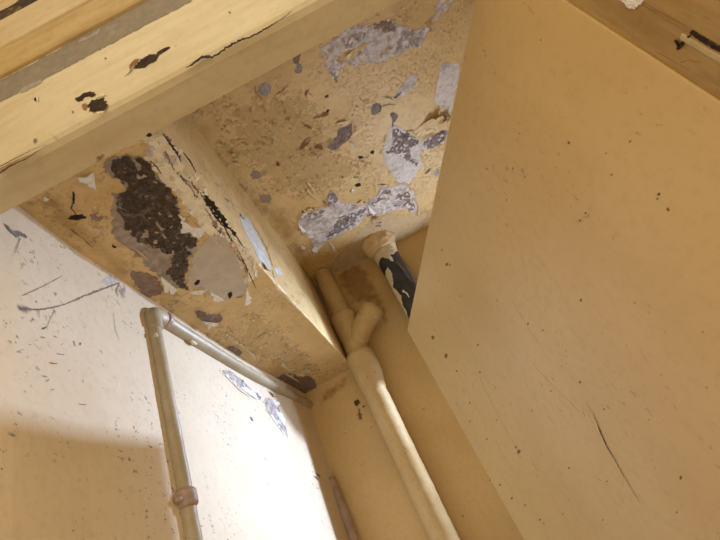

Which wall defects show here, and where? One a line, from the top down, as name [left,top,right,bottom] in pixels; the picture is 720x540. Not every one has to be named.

peeling [0,0,191,102]
crack [186,12,290,68]
peeling [319,0,452,83]
peeling [434,63,460,120]
spalling [296,74,448,254]
spalling [68,134,283,306]
crack [202,192,256,288]
peeling [220,368,289,438]
spalling [276,363,318,394]
crack [582,402,637,498]